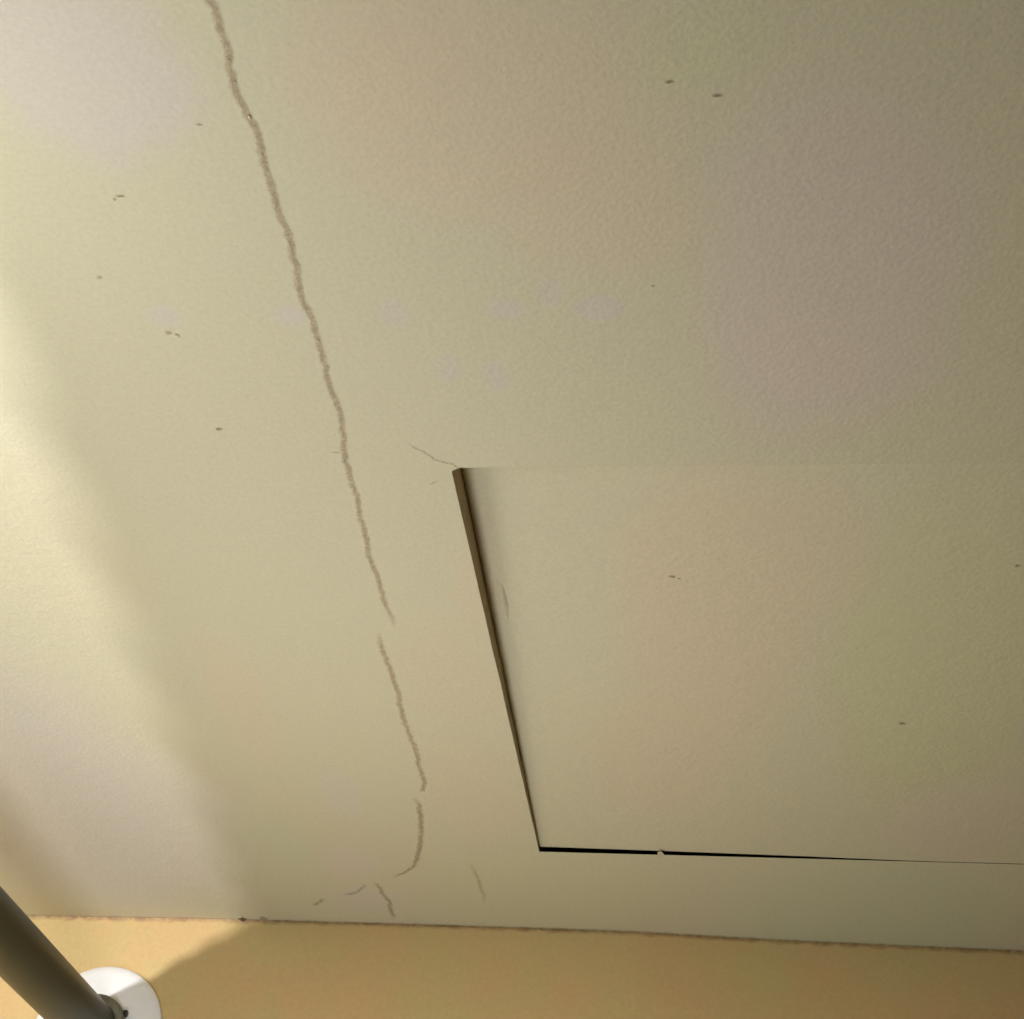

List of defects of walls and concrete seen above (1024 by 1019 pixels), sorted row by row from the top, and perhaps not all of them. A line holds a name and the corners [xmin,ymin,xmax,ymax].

crack [208,0,386,606]
crack [355,645,464,927]